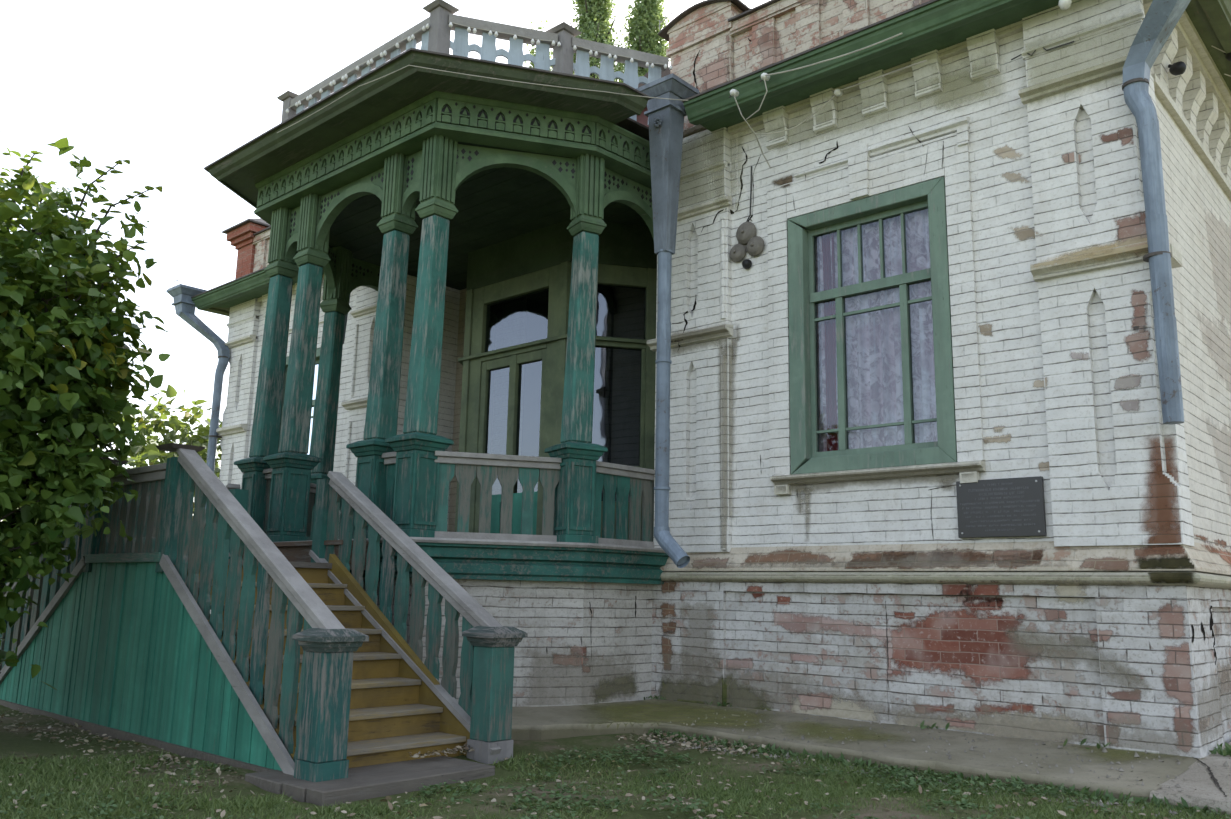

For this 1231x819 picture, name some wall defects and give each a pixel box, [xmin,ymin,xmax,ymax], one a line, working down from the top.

crack [701,147,761,232]
flaking render [1115,212,1147,256]
flaking render [1114,290,1151,411]
flaking render [1044,526,1183,621]
flaking render [1196,535,1231,566]
flaking render [552,646,590,673]
flaking render [791,693,878,721]
flaking render [692,548,1043,686]
flaking render [896,689,1141,744]
flaking render [1088,630,1113,642]
flaking render [1158,603,1194,752]
crack [1192,606,1222,693]